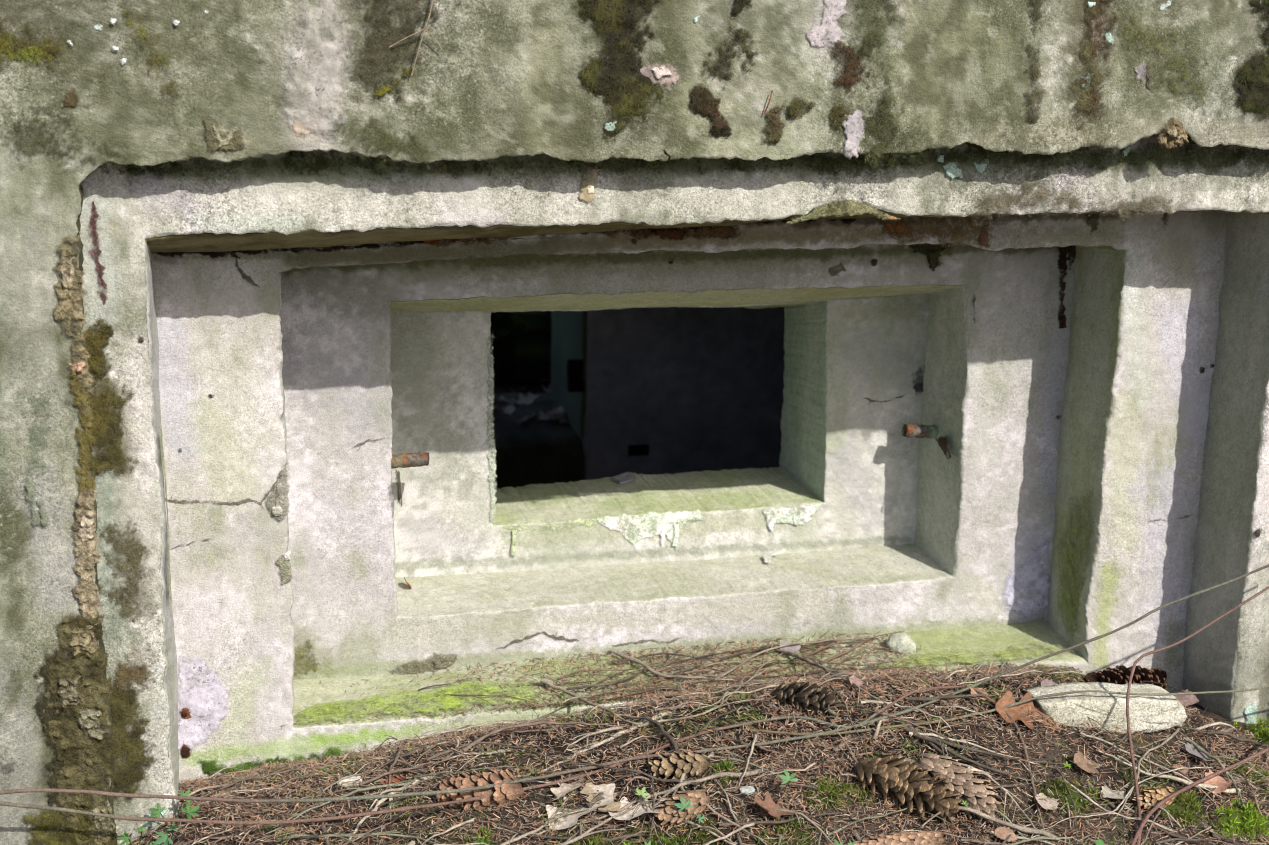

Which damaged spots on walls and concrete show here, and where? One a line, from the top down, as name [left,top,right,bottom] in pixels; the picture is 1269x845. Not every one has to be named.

spalling [1158,117,1189,149]
crack [152,219,857,288]
rust [606,226,741,240]
rust [879,217,996,248]
rust [1058,246,1076,329]
rust [935,436,951,458]
crack [165,464,286,509]
spalling [265,463,290,522]